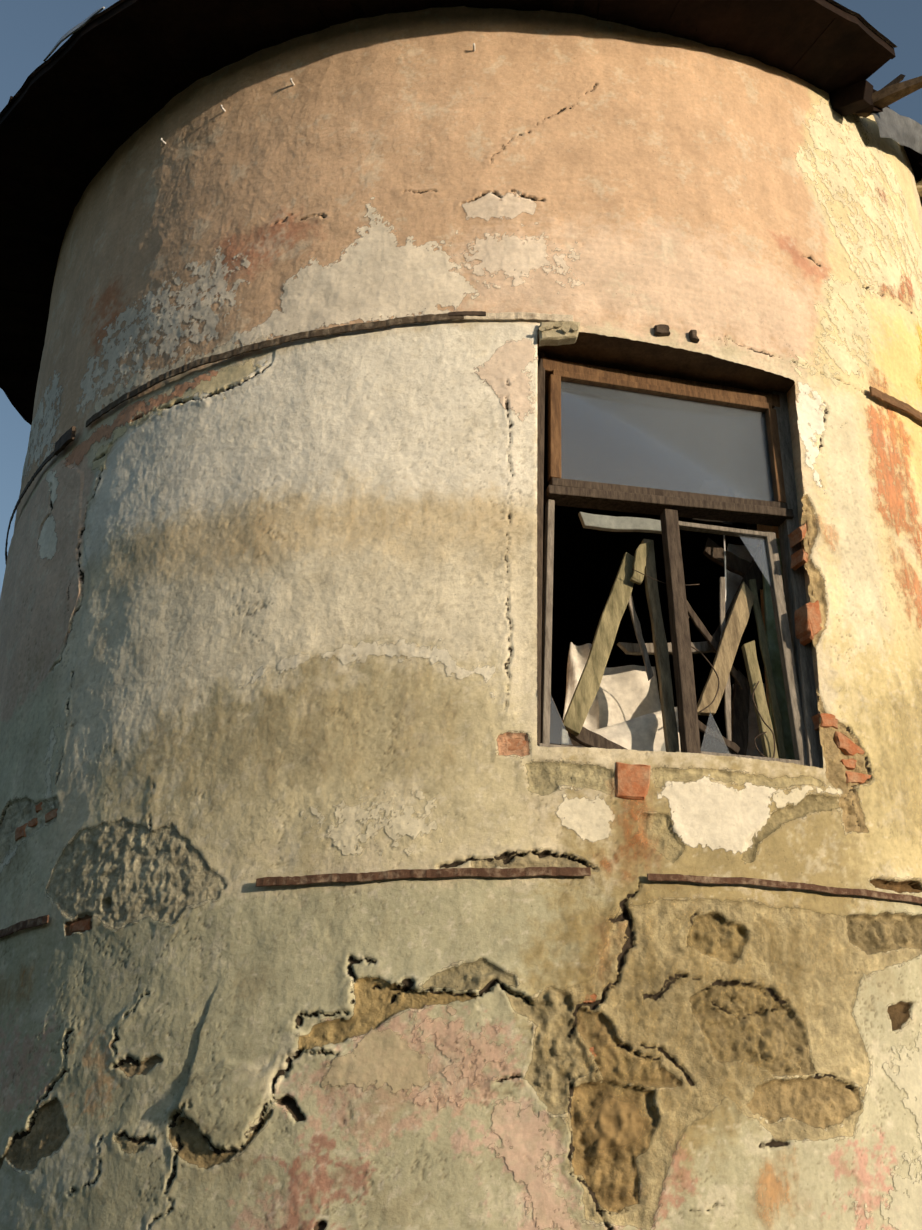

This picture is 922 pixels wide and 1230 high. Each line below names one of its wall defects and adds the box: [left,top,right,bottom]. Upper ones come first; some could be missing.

crack [470,84,597,202]
peeling [19,190,584,560]
peeling [788,98,922,653]
rust [867,405,922,554]
rust [894,556,922,627]
peeling [496,689,875,863]
crack [568,885,787,1037]
flaking render [112,1095,306,1169]
flaking render [296,896,922,1230]
crack [568,1044,695,1230]
crack [759,1139,790,1148]
crack [814,1073,860,1091]